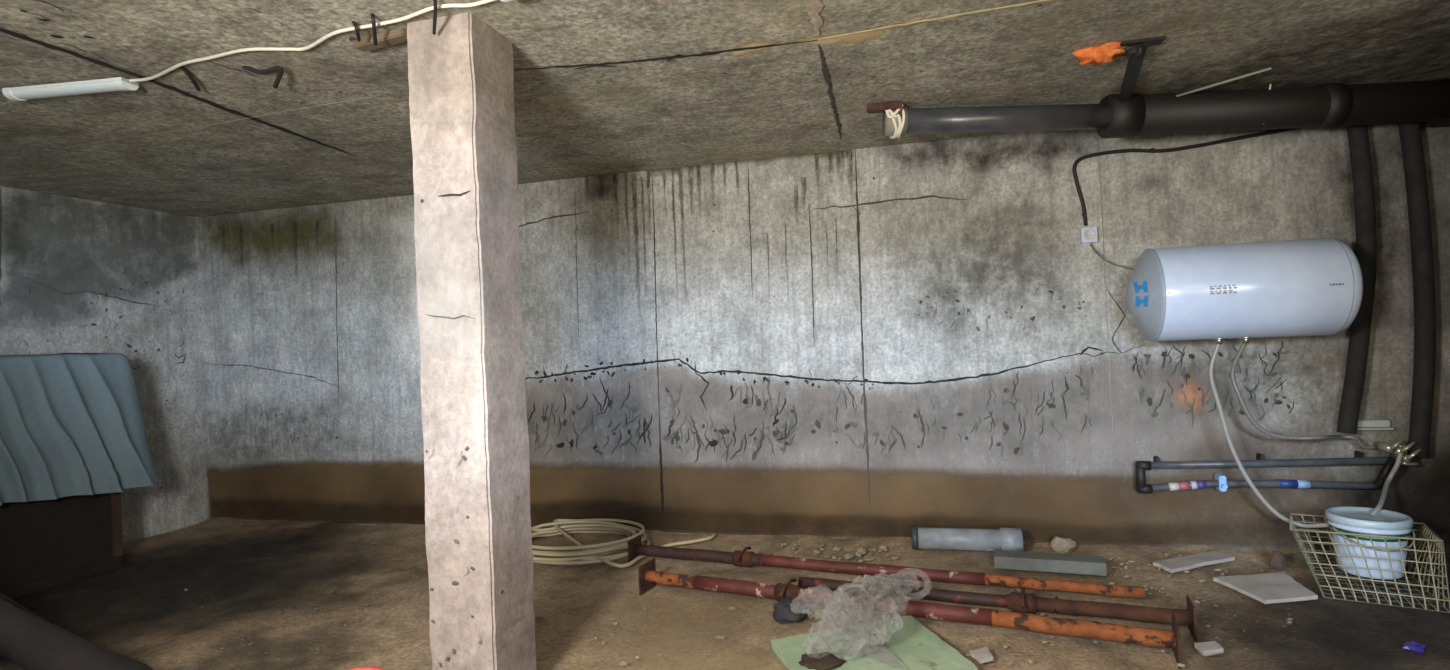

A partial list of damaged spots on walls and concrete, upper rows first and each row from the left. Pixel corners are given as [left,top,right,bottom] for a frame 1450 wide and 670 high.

damp [586,162,738,241]
crack [19,276,158,306]
crack [525,287,1145,414]